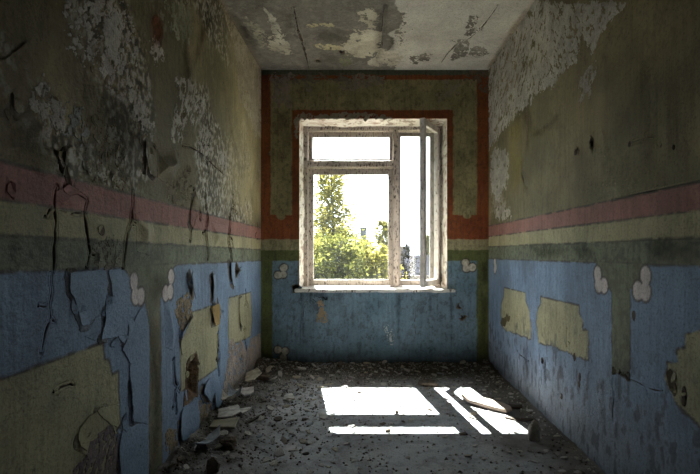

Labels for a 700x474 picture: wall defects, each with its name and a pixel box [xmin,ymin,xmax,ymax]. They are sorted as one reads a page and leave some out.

peeling [315,8,432,67]
peeling [62,0,157,192]
peeling [171,76,228,175]
peeling [451,0,626,222]
crack [37,184,95,352]
crack [121,190,138,268]
crack [189,190,209,259]
crack [227,196,237,262]
peeling [64,224,150,474]
peeling [175,260,261,444]
crack [214,334,222,375]
flaking render [666,369,687,406]